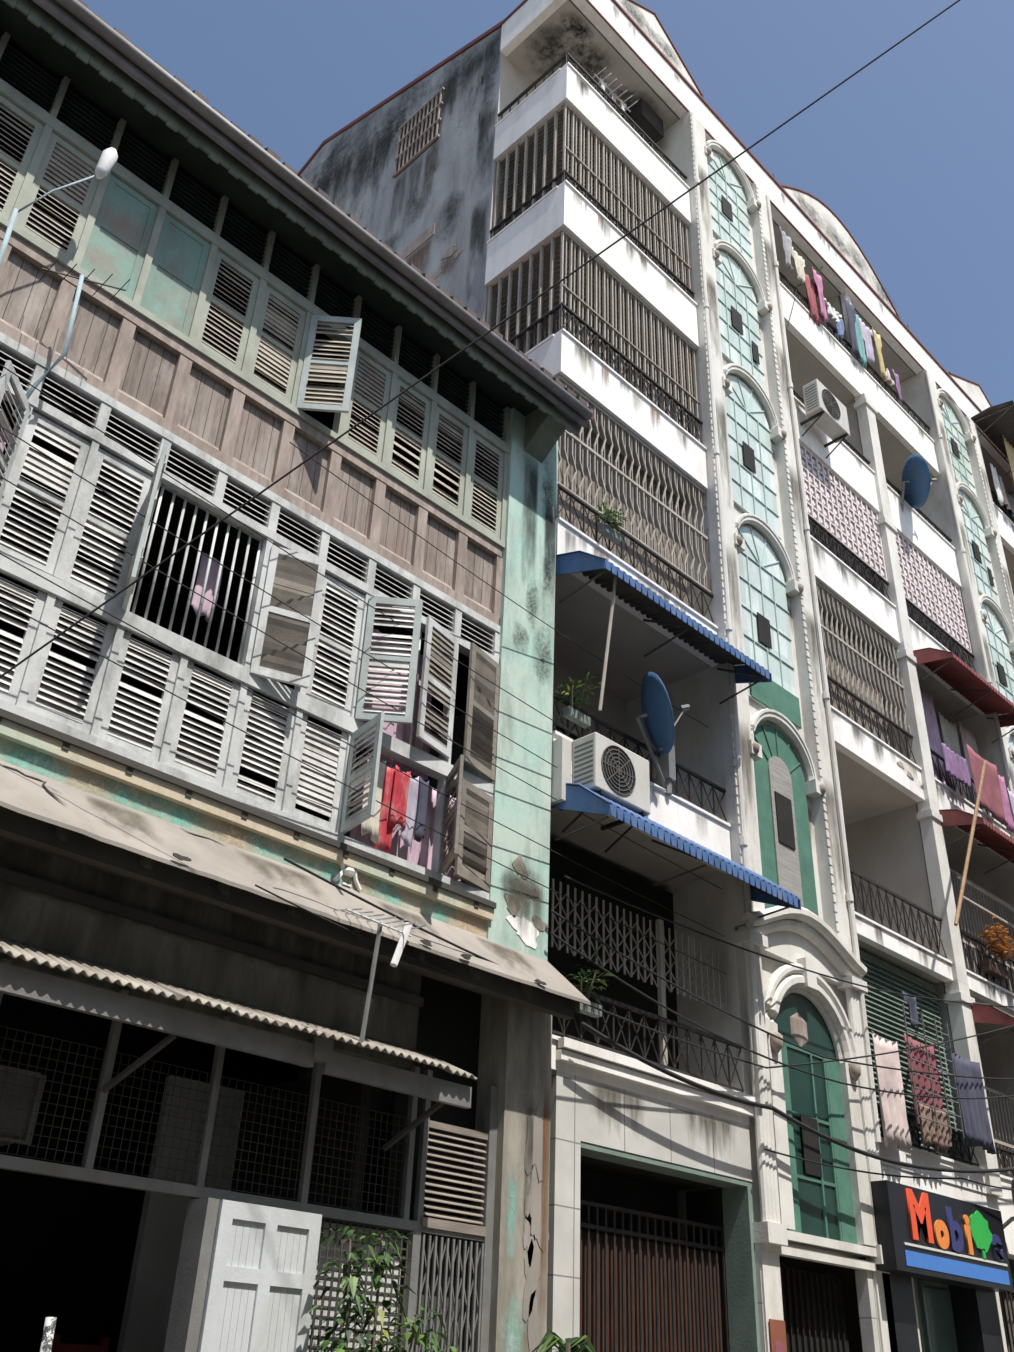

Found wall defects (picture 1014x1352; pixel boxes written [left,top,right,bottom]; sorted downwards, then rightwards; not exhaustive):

water stain [443,34,500,105]
water stain [534,18,648,107]
water stain [312,87,417,199]
water stain [479,89,491,144]
water stain [472,210,485,249]
water stain [527,467,570,613]
peeling [155,799,192,829]
peeling [223,827,278,860]
peeling [323,863,400,906]
peeling [428,905,478,935]
peeling [504,855,548,949]